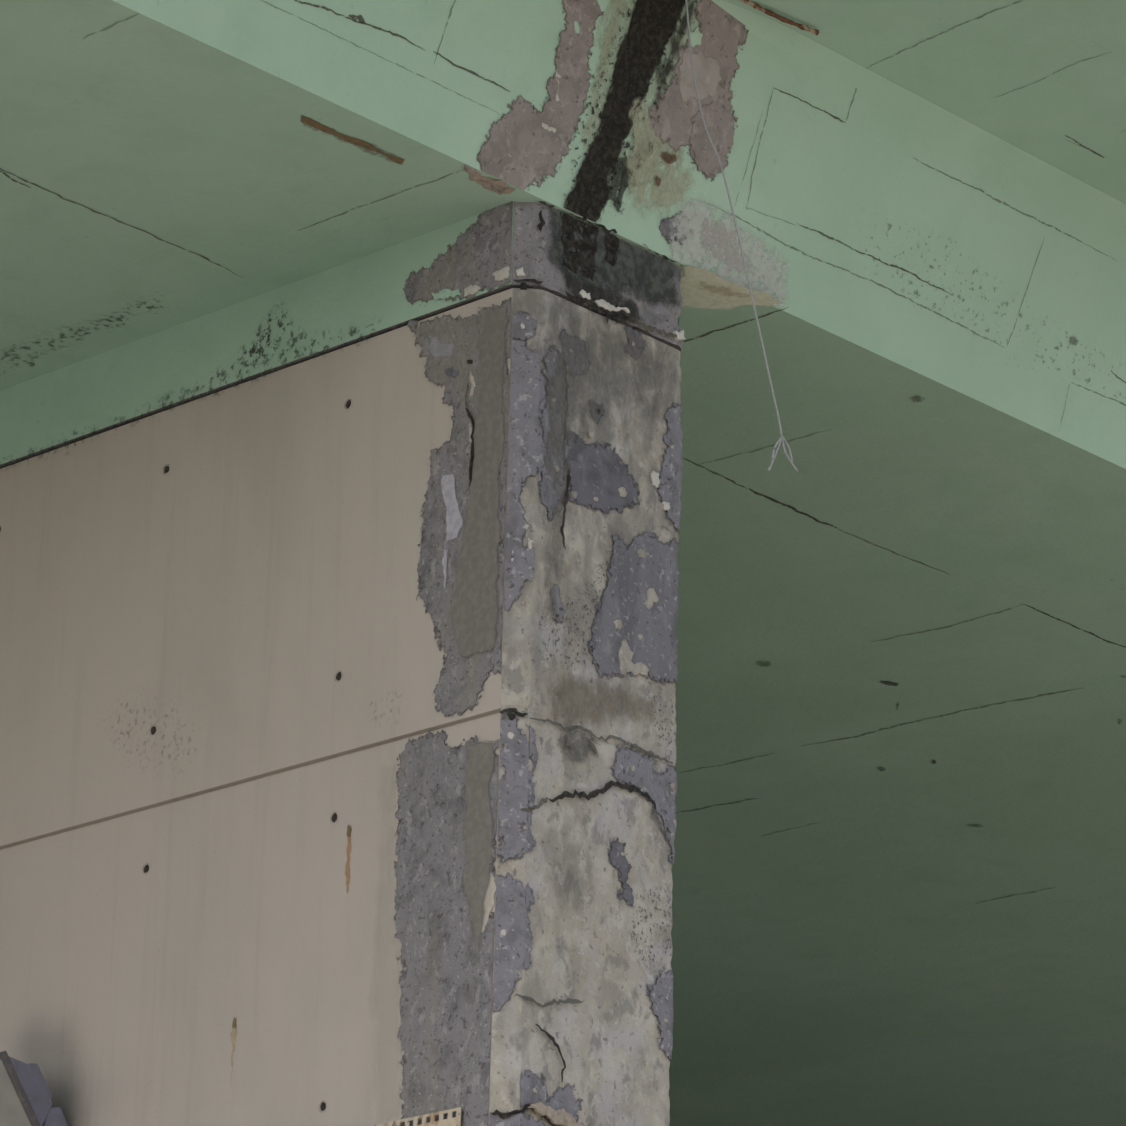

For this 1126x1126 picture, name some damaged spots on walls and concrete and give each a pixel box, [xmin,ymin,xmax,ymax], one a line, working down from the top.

spalling [739,0,819,35]
peeling [648,0,749,182]
rust [301,116,404,164]
water stain [550,0,787,323]
peeling [659,211,691,245]
peeling [680,266,783,309]
crack [800,225,951,295]
water stain [141,315,329,417]
peeling [392,0,683,1126]
crack [499,708,673,764]
crack [521,780,667,844]
crack [492,994,585,1126]